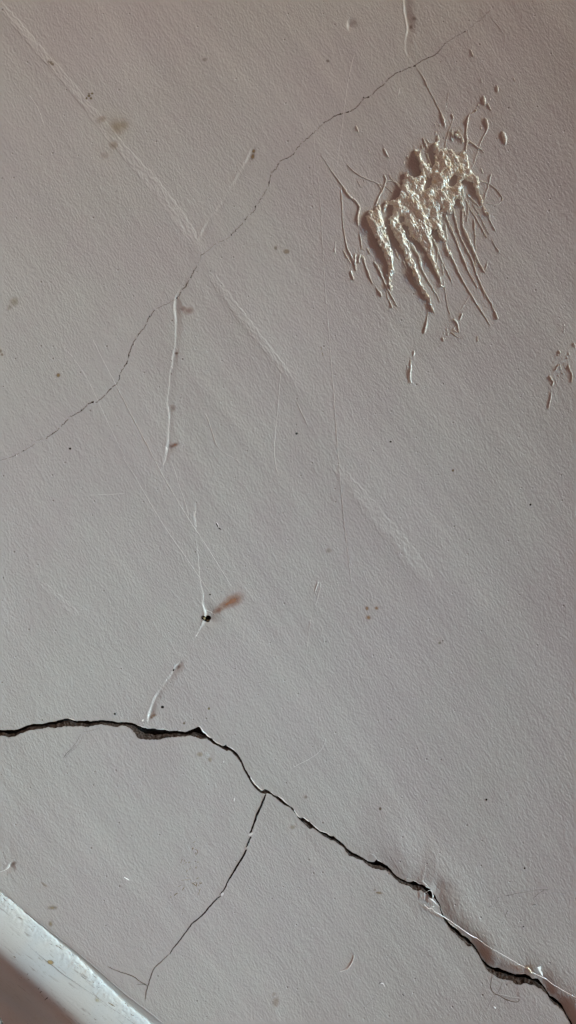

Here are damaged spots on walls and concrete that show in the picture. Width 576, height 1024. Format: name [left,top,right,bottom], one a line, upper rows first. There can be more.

crack [2,13,487,460]
water stain [322,157,402,308]
water stain [395,174,503,339]
crack [0,718,572,1024]